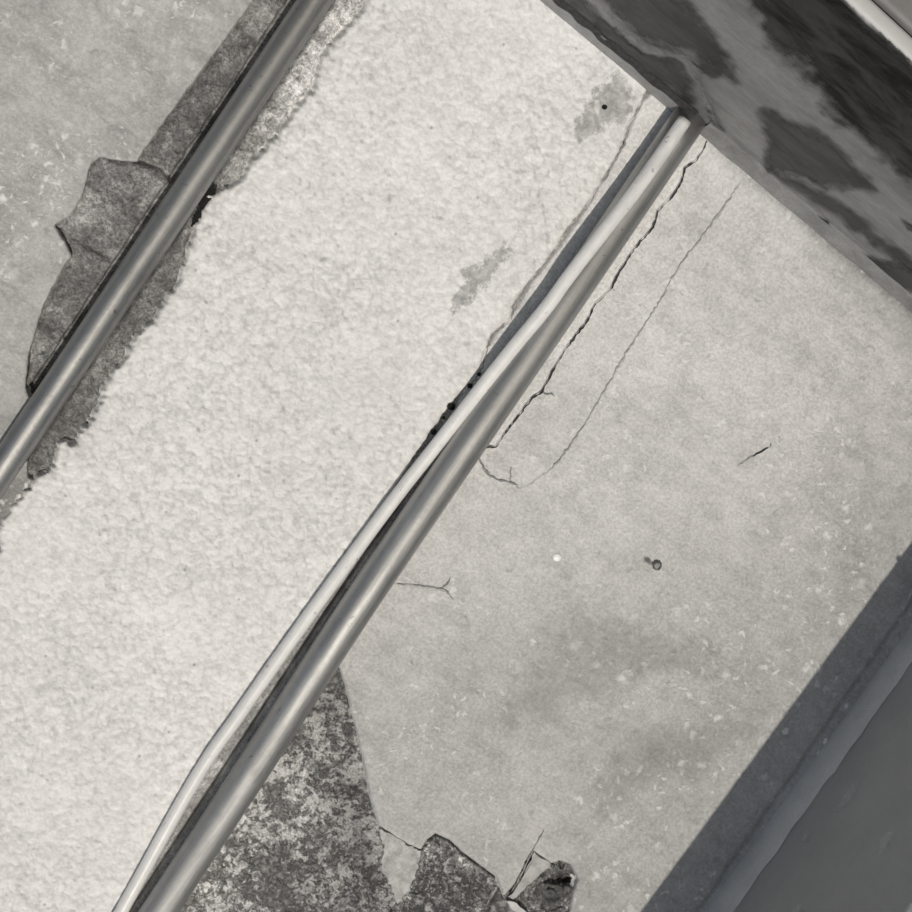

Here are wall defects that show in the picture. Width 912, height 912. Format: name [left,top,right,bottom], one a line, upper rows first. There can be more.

flaking render [27,205,200,477]
flaking render [26,0,296,394]
flaking render [208,0,364,190]
crack [430,93,646,435]
crack [479,141,741,489]
damp [568,0,734,132]
damp [751,0,912,179]
damp [761,109,912,292]
spalling [180,668,576,912]